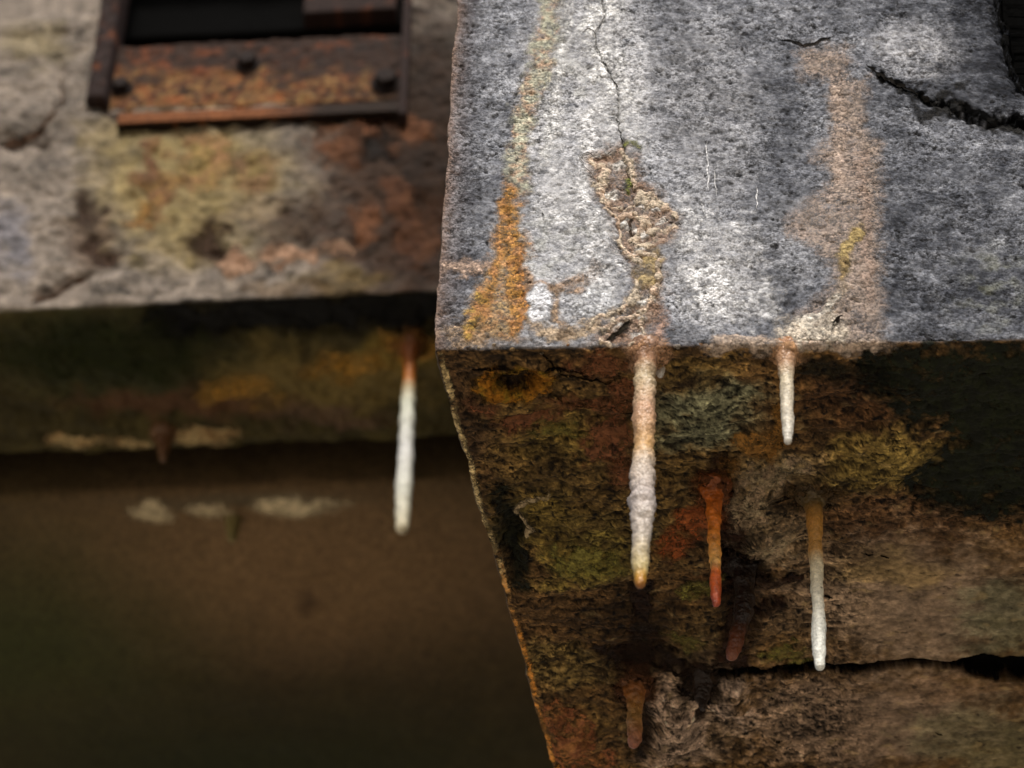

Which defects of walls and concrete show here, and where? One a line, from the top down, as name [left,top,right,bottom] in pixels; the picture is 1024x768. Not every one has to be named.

crack [780,37,831,46]
crack [580,0,681,225]
crack [866,64,1024,136]
corrosion [463,182,532,340]
damp [672,195,1024,530]
corrosion [466,348,635,490]
corrosion [655,403,786,563]
damp [726,535,800,563]
crack [629,657,684,677]
corrosion [592,572,804,682]
crack [717,654,1024,682]
corrosion [634,704,659,763]